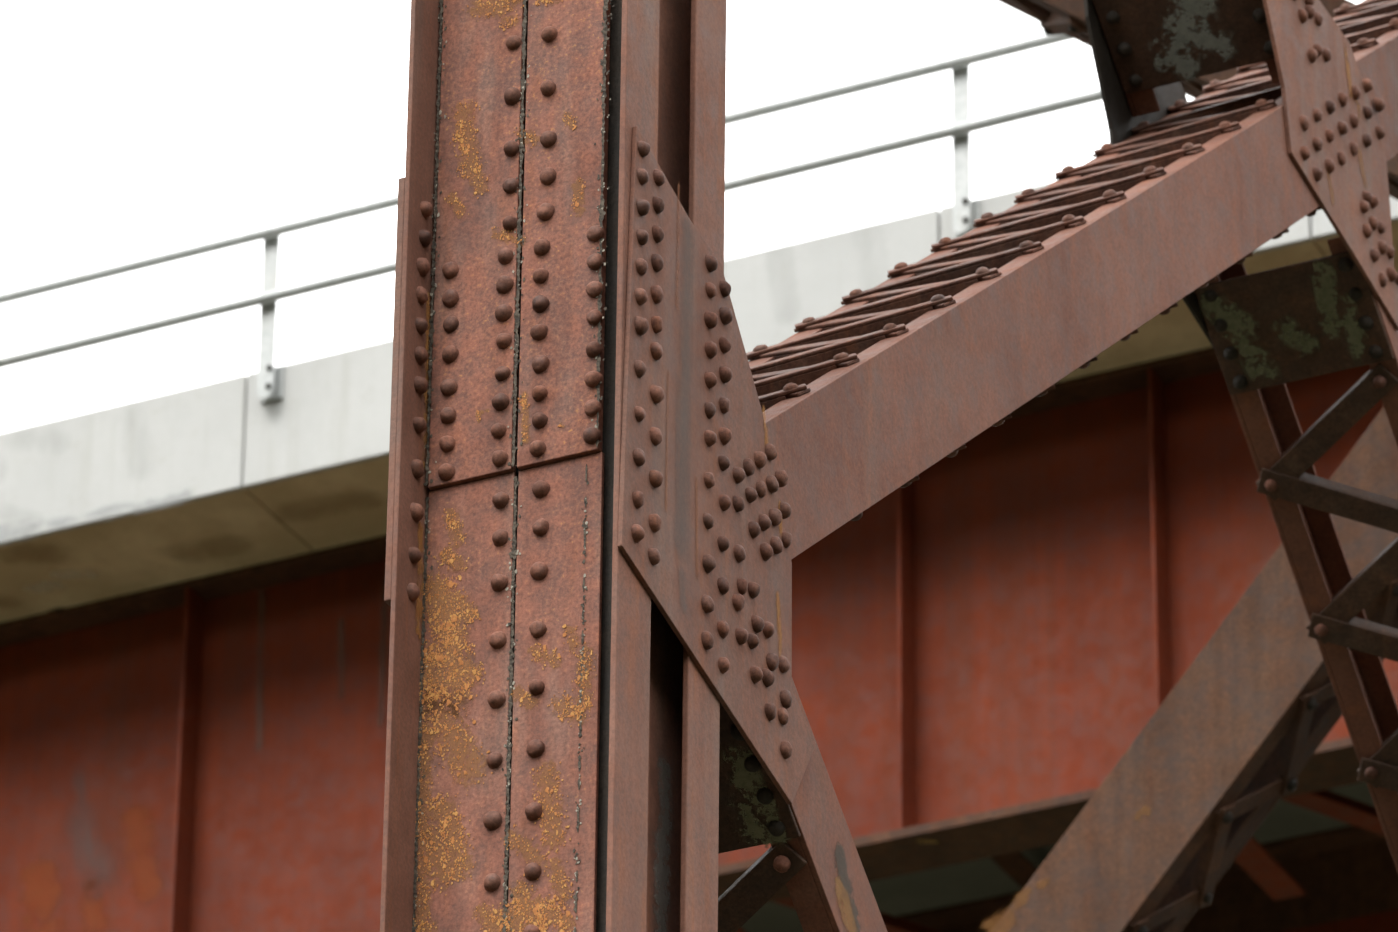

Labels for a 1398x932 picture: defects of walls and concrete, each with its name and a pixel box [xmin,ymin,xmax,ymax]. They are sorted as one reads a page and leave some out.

peeling [1155,0,1234,79]